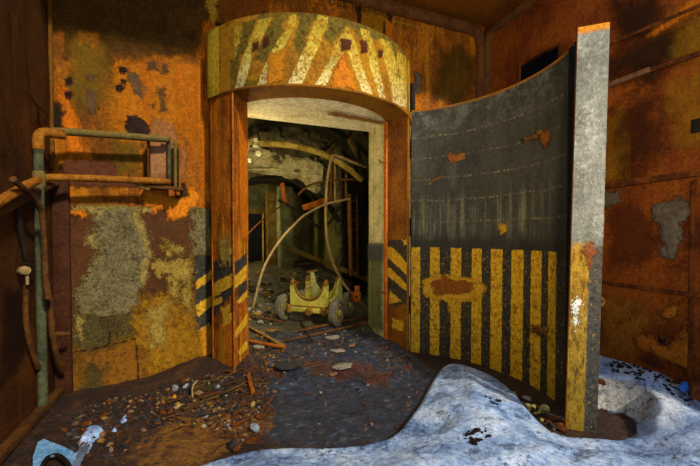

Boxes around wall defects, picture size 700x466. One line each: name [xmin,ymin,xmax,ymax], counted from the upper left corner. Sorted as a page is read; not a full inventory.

rust [250,35,270,52]
rust [340,37,369,53]
peeling [113,65,148,99]
rust [57,83,92,161]
rust [101,0,266,241]
rust [447,152,465,163]
peeling [70,102,233,317]
rust [581,241,598,270]
peeling [651,195,694,276]
rust [421,271,487,315]
rust [600,294,659,359]